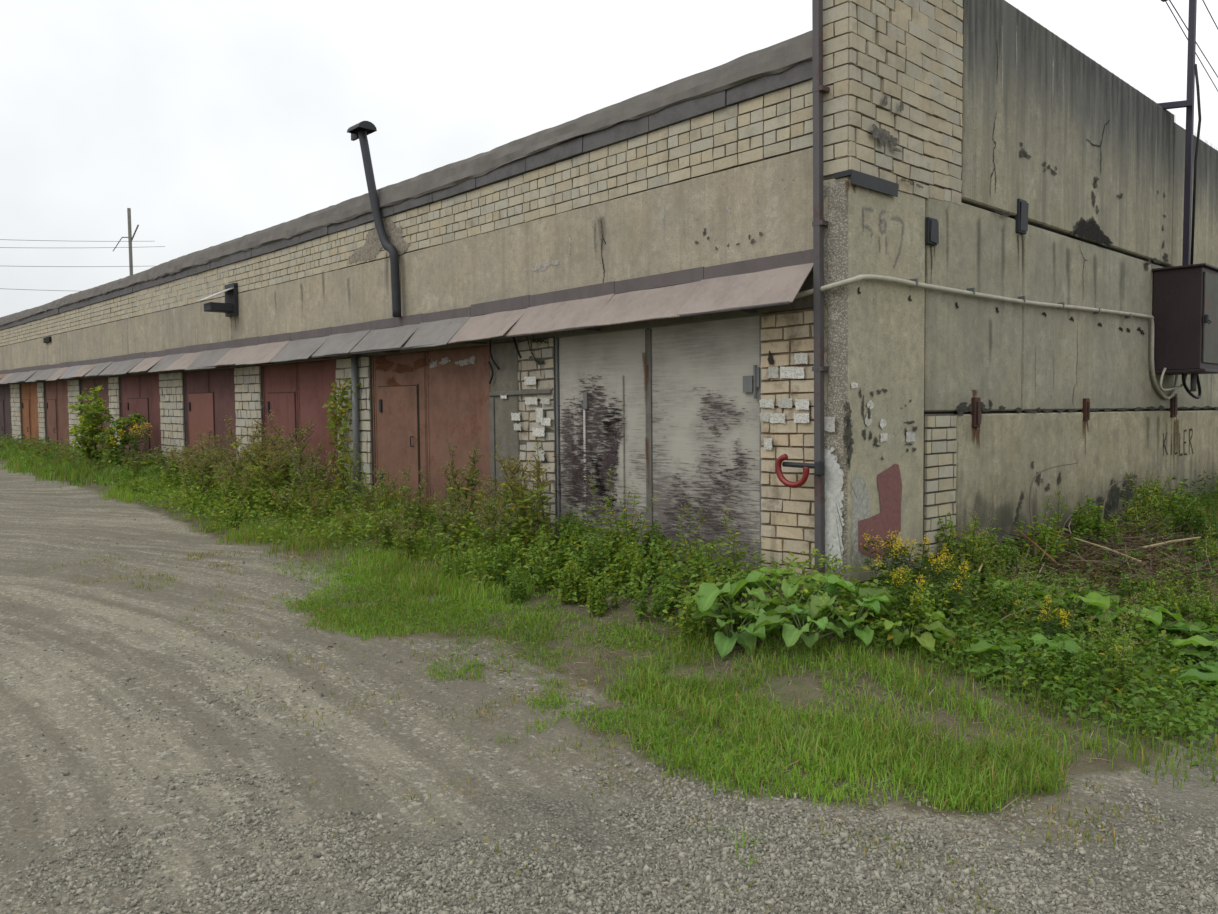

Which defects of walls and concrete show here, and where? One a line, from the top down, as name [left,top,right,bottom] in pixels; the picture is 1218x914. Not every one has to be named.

crack [989,117,997,195]
spalling [1071,177,1113,247]